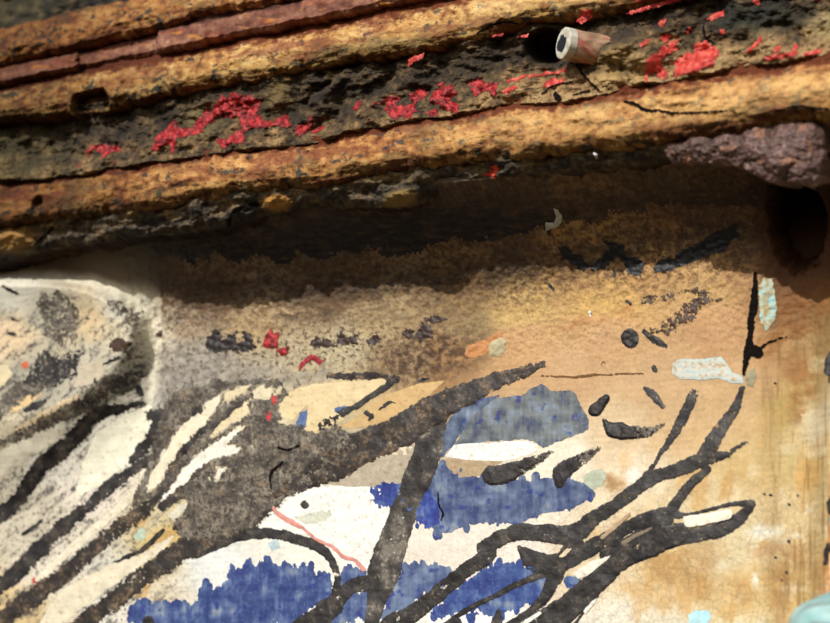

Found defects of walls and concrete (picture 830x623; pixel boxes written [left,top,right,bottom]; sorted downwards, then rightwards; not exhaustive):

peeling [576,9,593,24]
peeling [626,0,678,14]
peeling [75,143,121,167]
peeling [151,92,325,154]
corrosion [0,0,703,128]
corrosion [0,51,830,229]
peeling [370,82,461,121]
peeling [468,68,567,97]
peeling [639,18,719,82]
crack [623,100,736,114]
crack [776,104,830,112]
damp [135,163,815,336]